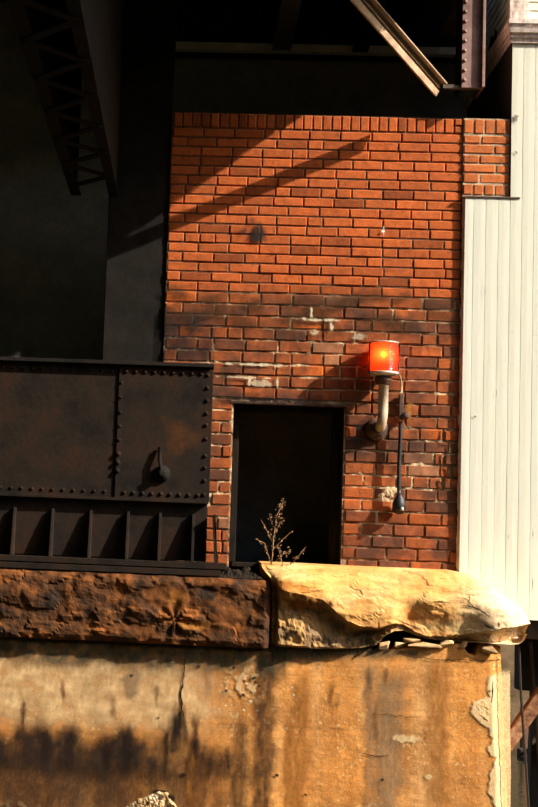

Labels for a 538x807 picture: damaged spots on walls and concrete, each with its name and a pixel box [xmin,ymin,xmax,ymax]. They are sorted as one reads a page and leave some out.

spalling [127,790,177,807]
crack [165,652,186,773]
damp [0,638,418,807]
rust [285,678,309,807]
peeling [471,674,511,807]